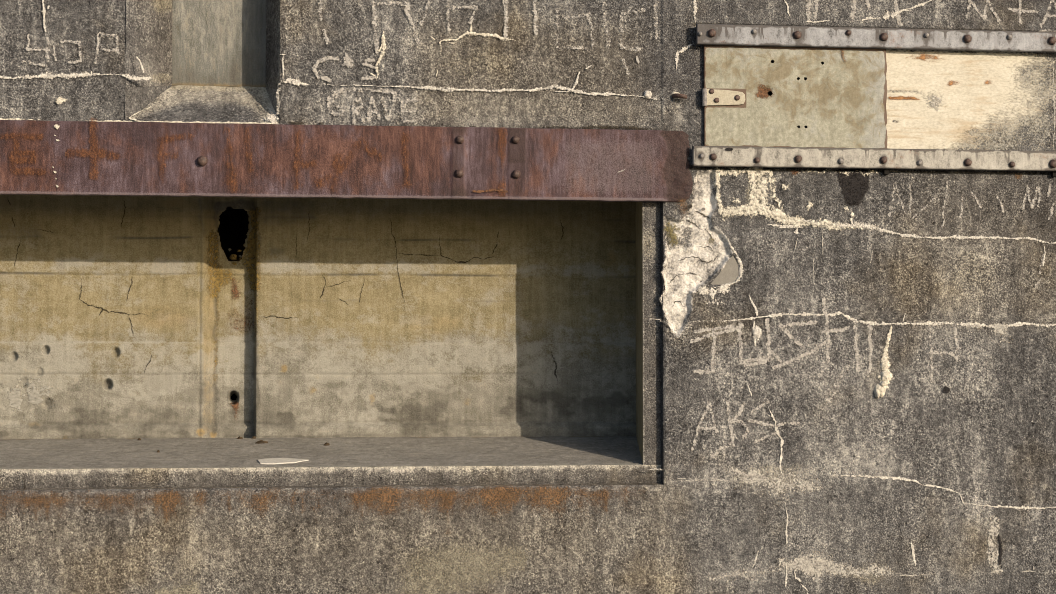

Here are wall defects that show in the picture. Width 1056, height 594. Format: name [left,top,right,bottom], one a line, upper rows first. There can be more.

damp [711,167,877,231]
spalling [217,207,249,265]
crack [391,222,499,306]
spalling [660,170,744,346]
crack [768,219,1056,279]
crack [79,279,145,333]
crack [693,295,1056,328]
rust [353,486,607,513]
crack [832,474,1056,510]